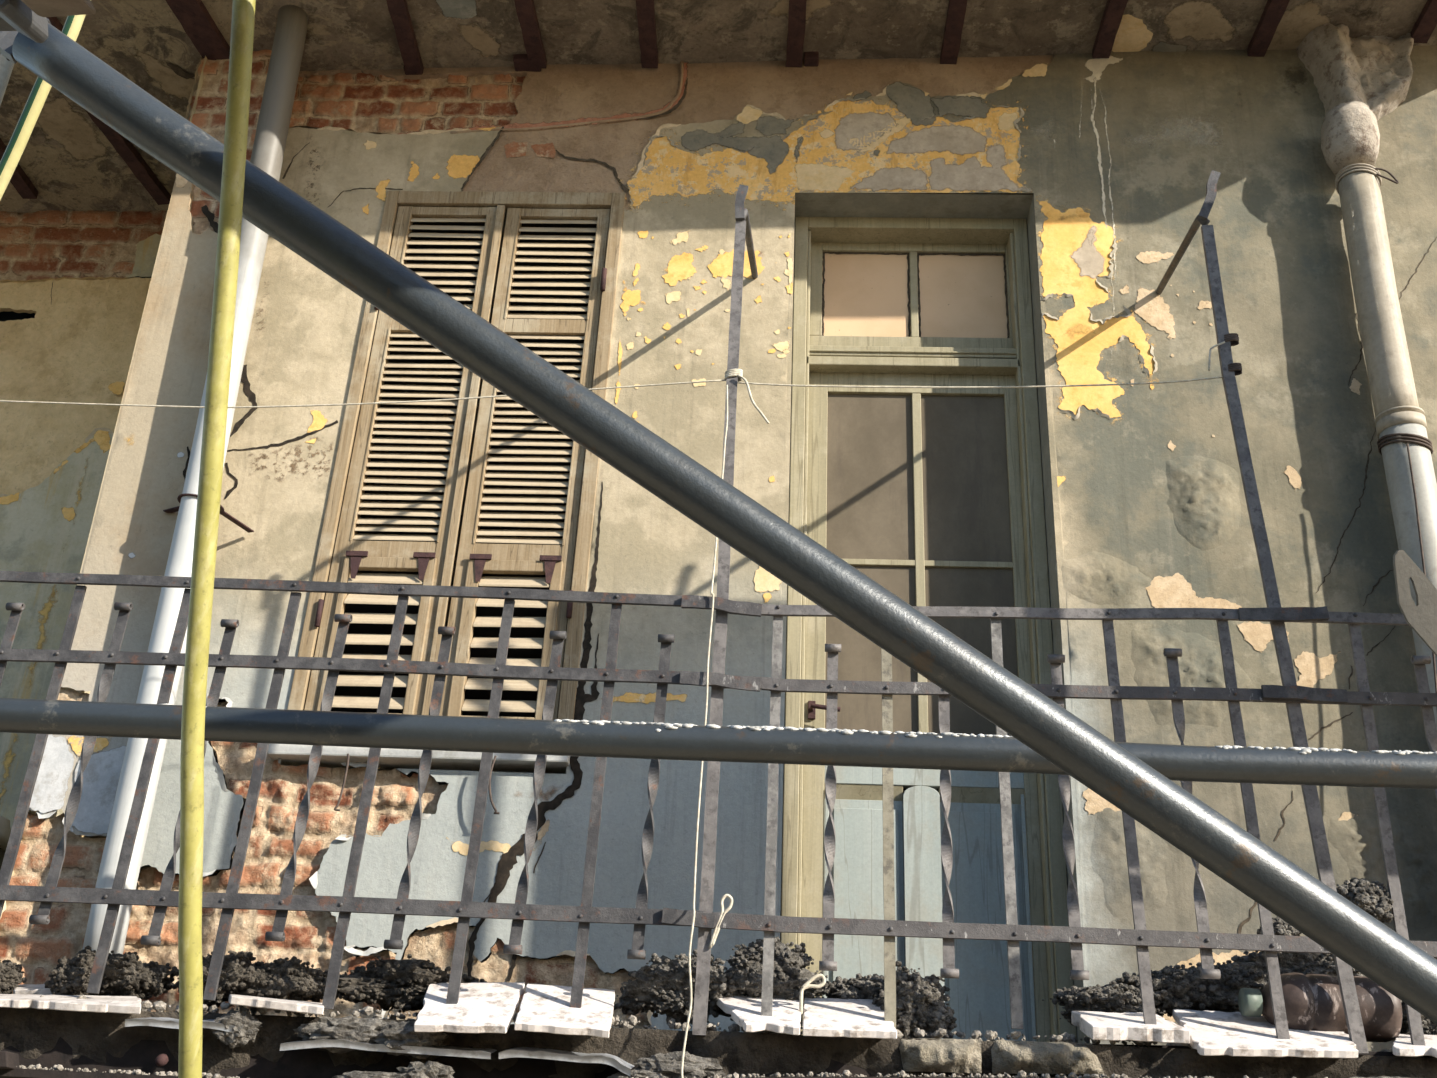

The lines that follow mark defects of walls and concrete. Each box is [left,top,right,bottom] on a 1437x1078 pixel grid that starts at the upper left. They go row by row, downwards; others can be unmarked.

peeling [615,63,1213,421]
leakage [1079,56,1123,310]
crack [182,447,190,479]
crack [224,364,338,499]
crack [574,482,603,720]
peeling [753,566,782,603]
peeling [1146,573,1289,653]
flaking render [0,734,126,994]
flaking render [123,867,179,1012]
flaking render [202,741,448,975]
crack [507,954,517,982]
crack [466,756,583,976]